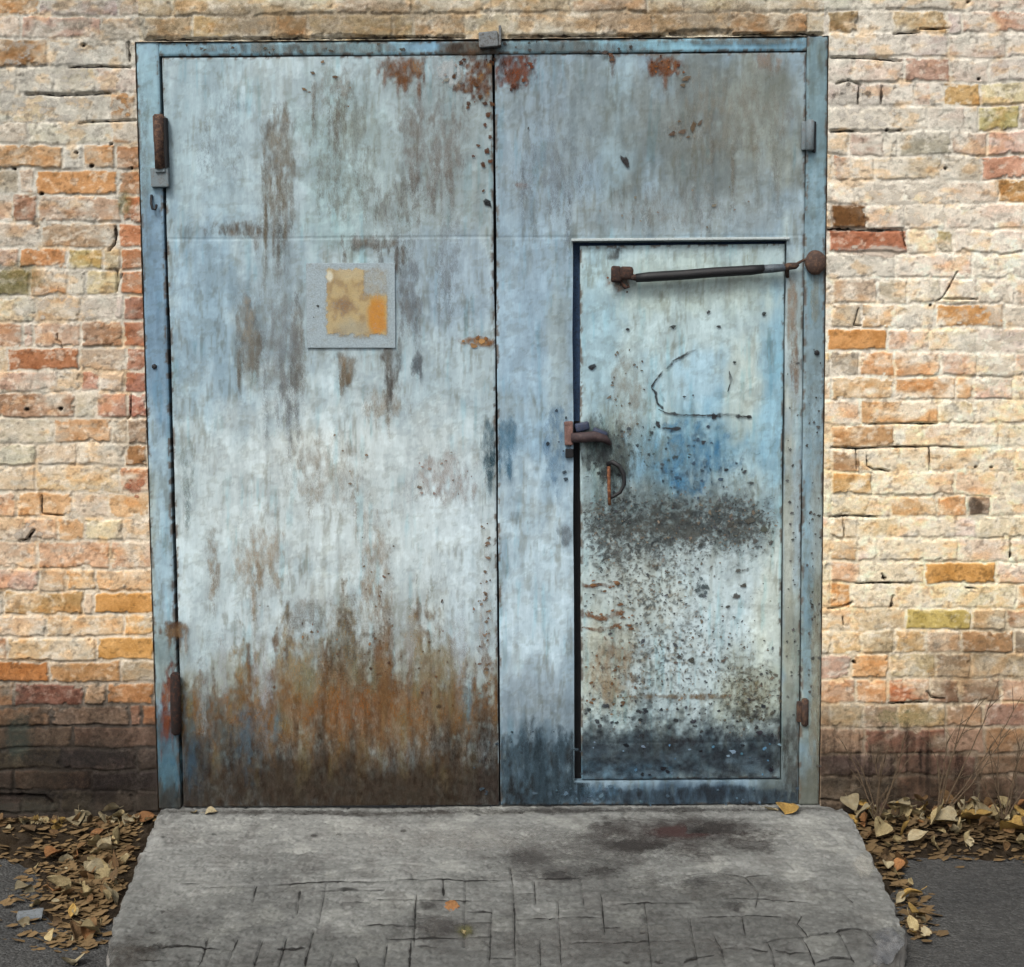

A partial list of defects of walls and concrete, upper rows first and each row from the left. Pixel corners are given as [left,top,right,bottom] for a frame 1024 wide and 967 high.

rust [382,56,425,96]
rust [446,43,536,167]
rust [648,55,685,87]
rust [462,335,493,348]
rust [159,583,498,806]
water stain [0,701,179,819]
water stain [489,695,799,806]
water stain [820,736,1023,813]
crack [150,870,652,967]
crack [684,875,861,967]